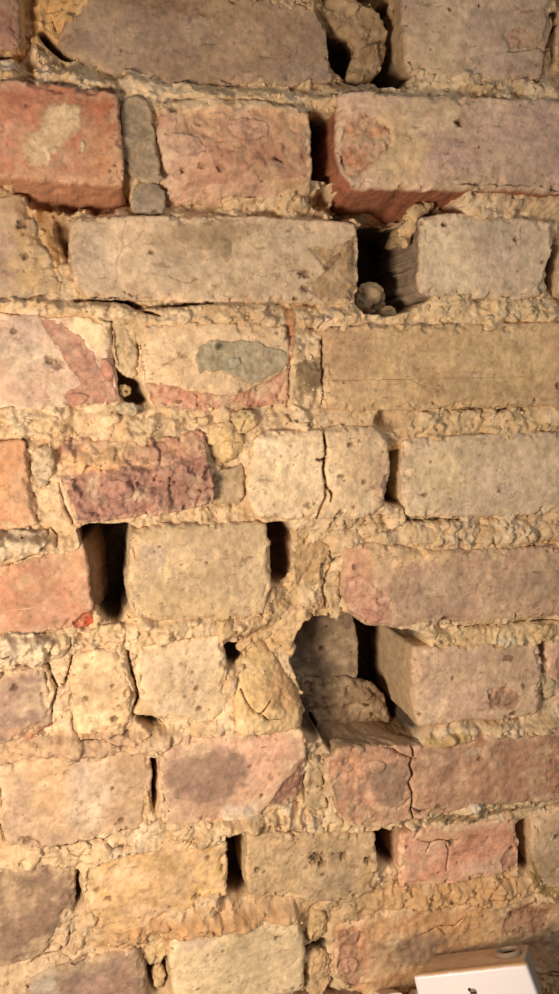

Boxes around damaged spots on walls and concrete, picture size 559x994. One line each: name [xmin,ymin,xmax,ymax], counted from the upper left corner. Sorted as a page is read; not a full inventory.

spalling [375,1,389,19]
spalling [326,33,353,80]
spalling [312,225,400,298]
spalling [66,455,207,629]
spalling [265,521,295,583]
crack [2,639,72,709]
crack [72,629,164,747]
spalling [300,695,322,739]
spalling [344,575,427,743]
crack [392,745,448,865]
spalling [373,831,394,863]
spalling [500,847,531,873]